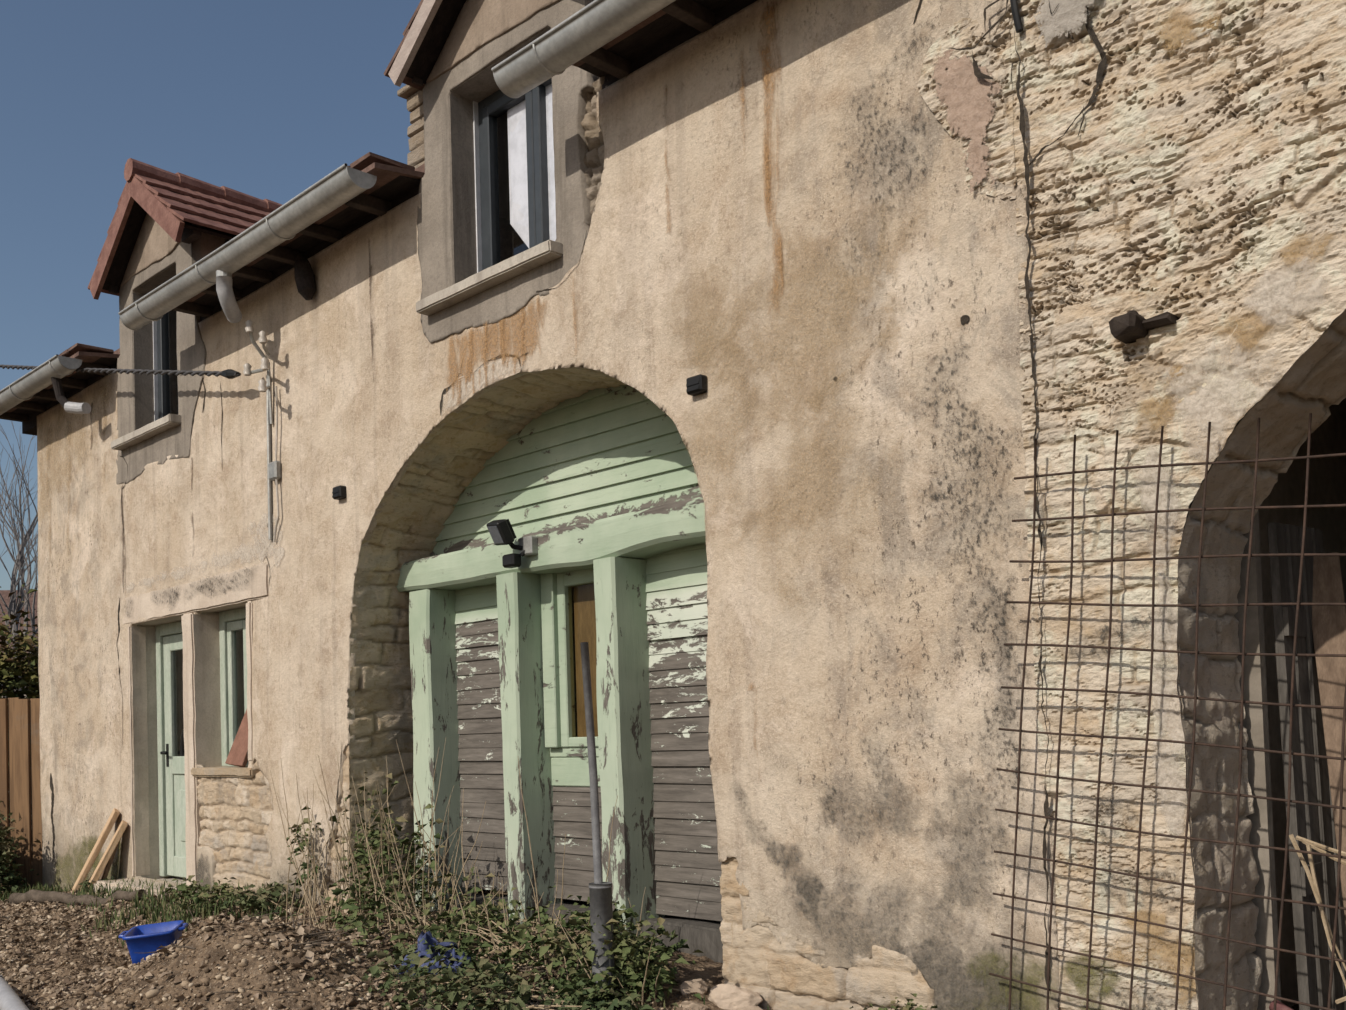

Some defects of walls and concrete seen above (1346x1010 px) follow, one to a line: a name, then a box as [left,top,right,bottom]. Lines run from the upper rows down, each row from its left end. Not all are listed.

flaking render [581,77,608,225]
rust [761,6,774,219]
damp [840,77,927,231]
flaking render [917,11,1017,200]
rust [449,304,544,385]
damp [922,350,1026,783]
crack [950,0,1140,985]
damp [766,779,1016,1010]